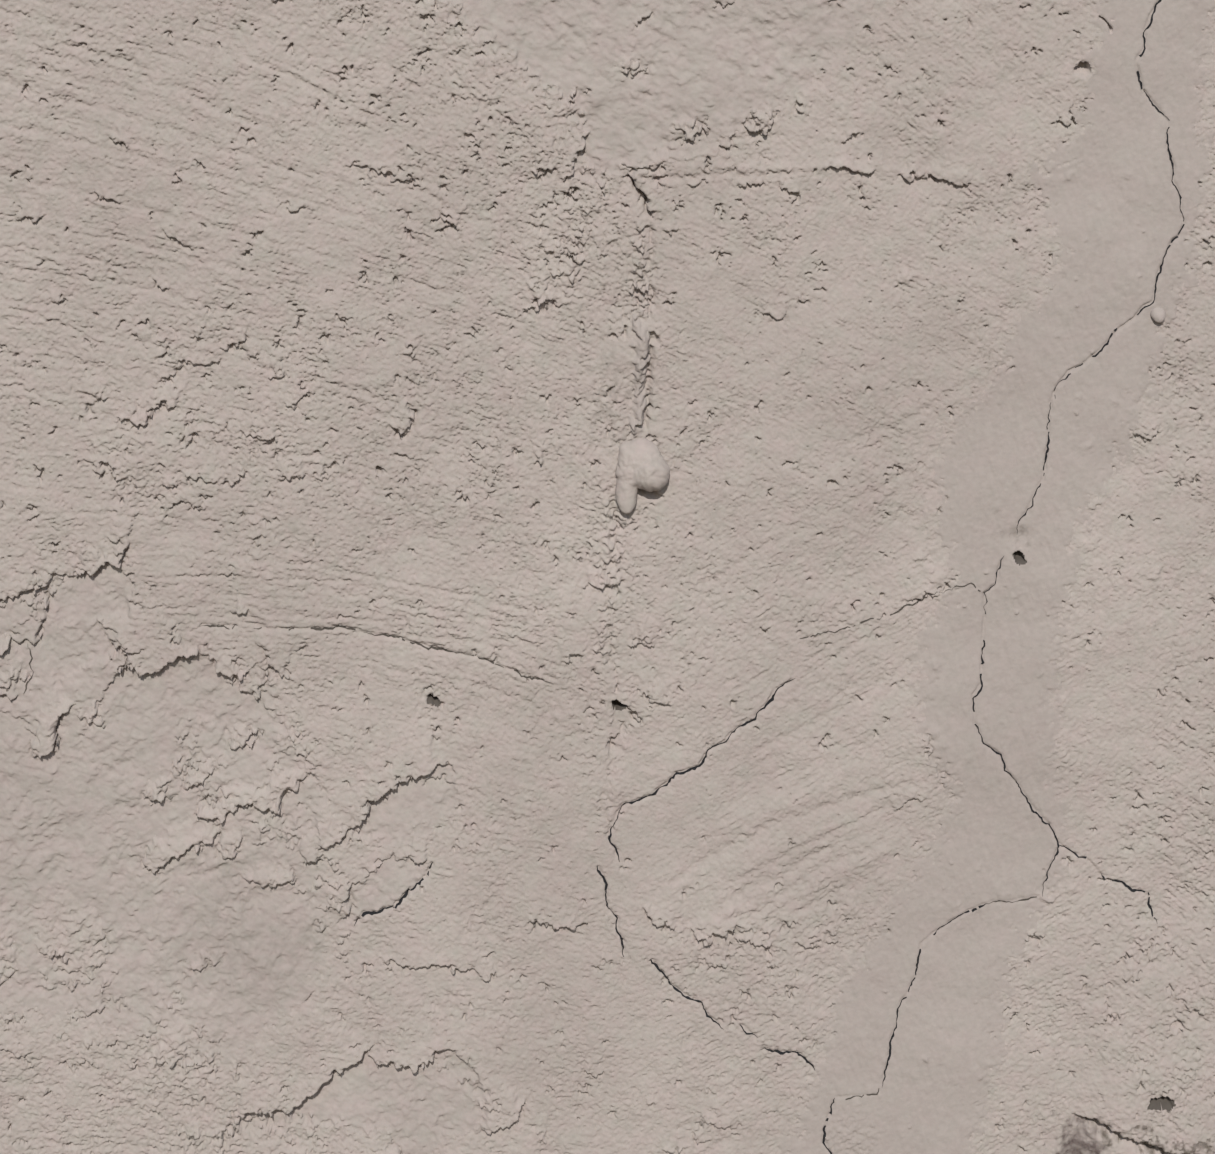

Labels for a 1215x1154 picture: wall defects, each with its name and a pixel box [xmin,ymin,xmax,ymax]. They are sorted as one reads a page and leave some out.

flaking render [0,562,459,1069]
crack [597,678,815,1070]
crack [800,0,1185,1154]